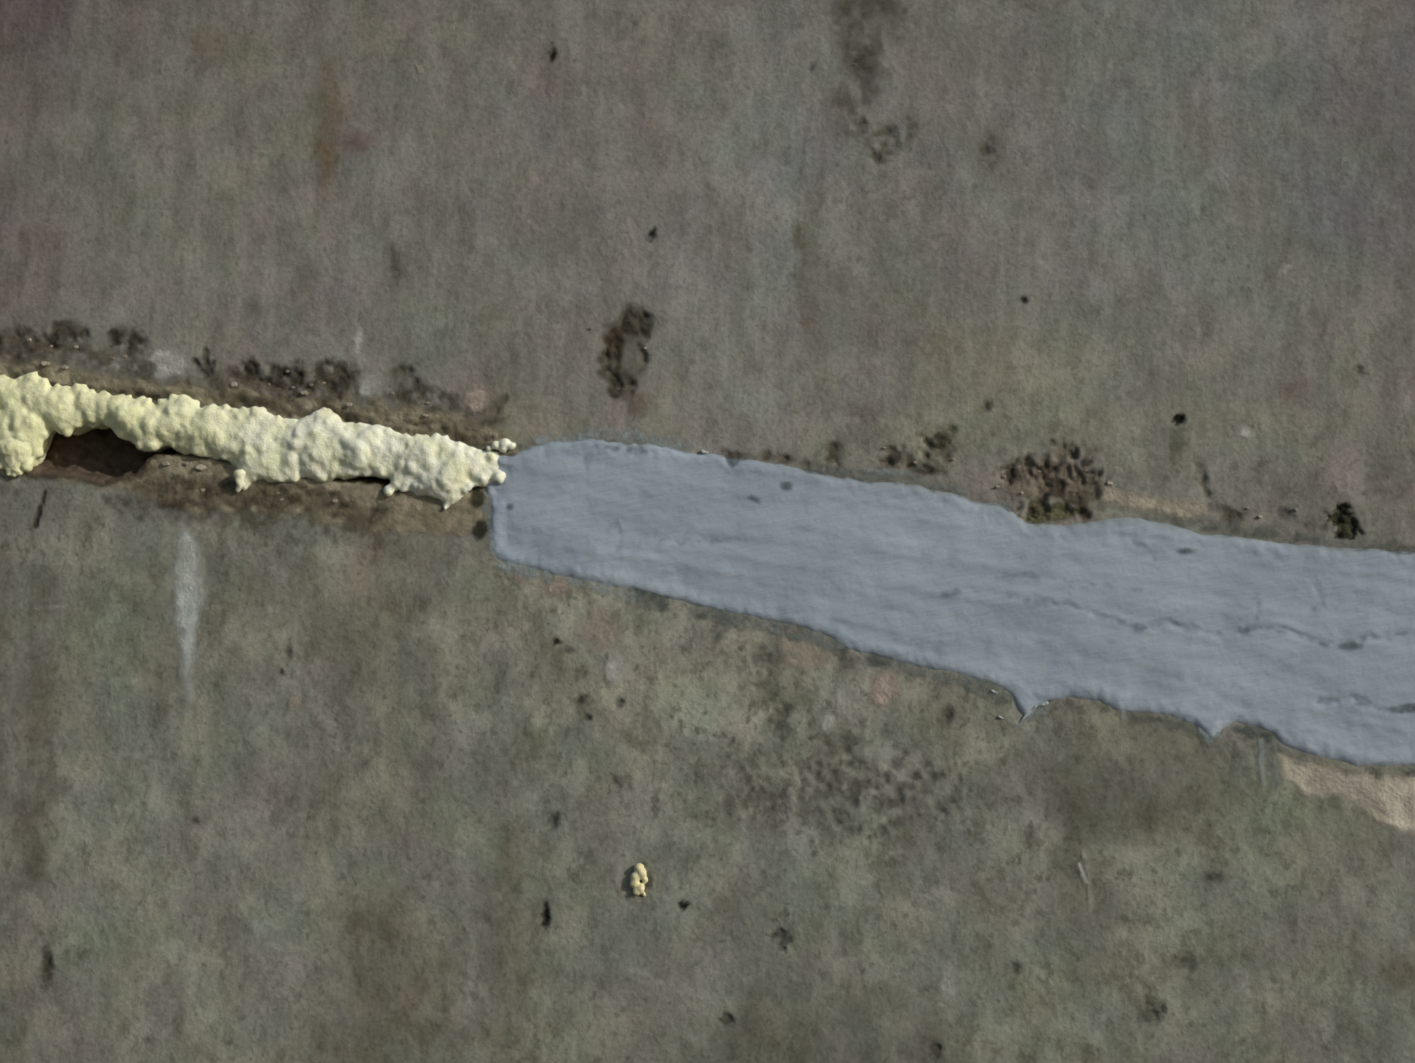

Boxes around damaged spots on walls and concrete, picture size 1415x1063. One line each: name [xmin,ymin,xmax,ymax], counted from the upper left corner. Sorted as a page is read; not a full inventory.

spalling [8,323,87,365]
spalling [109,327,143,366]
spalling [231,360,353,399]
spalling [589,308,652,410]
crack [0,333,517,538]
spalling [995,447,1113,523]
damp [174,531,204,665]